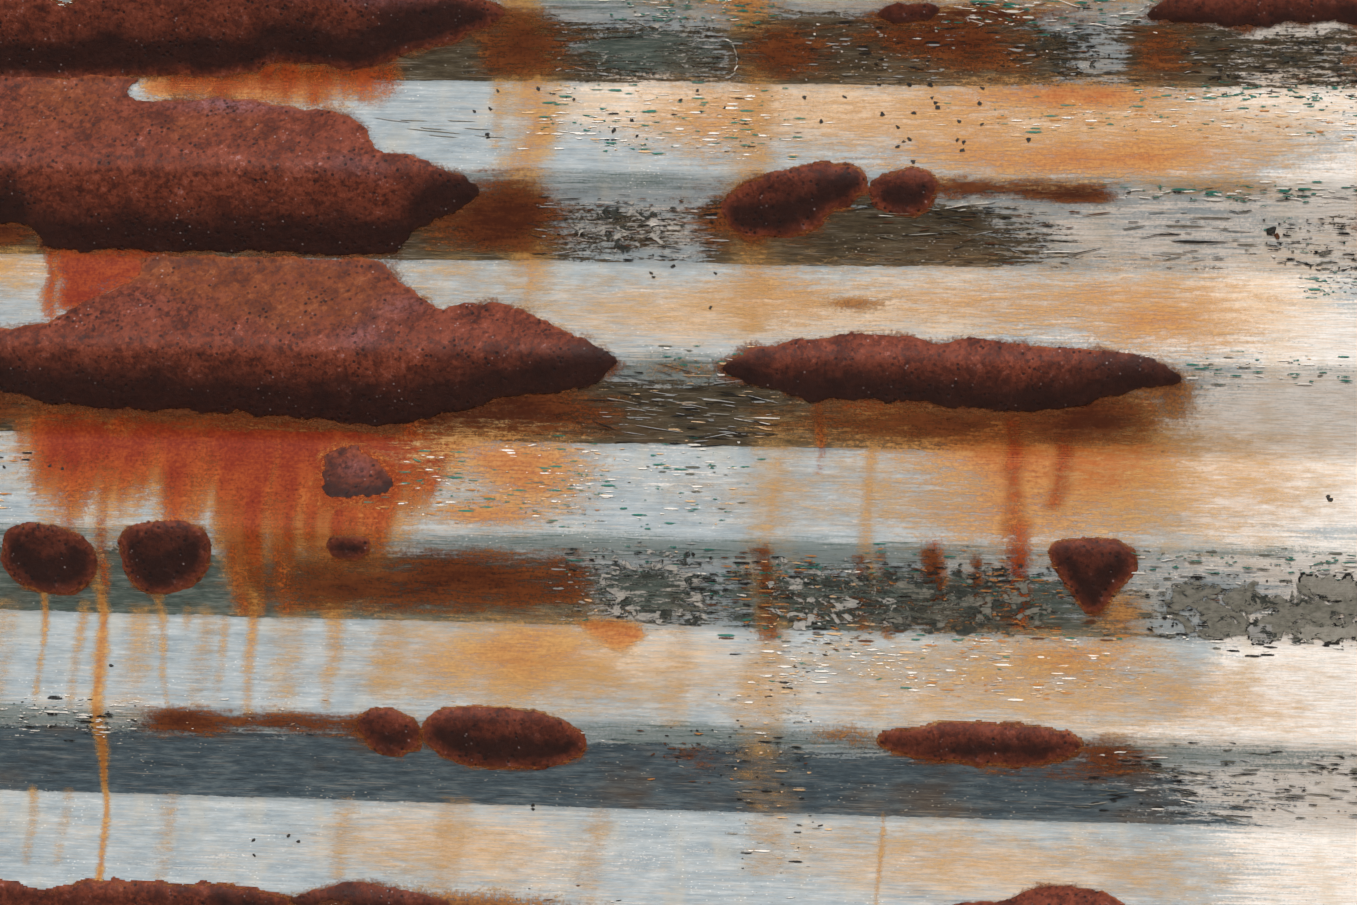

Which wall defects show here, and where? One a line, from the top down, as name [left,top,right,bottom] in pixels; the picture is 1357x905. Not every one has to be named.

rust [592,0,1357,783]